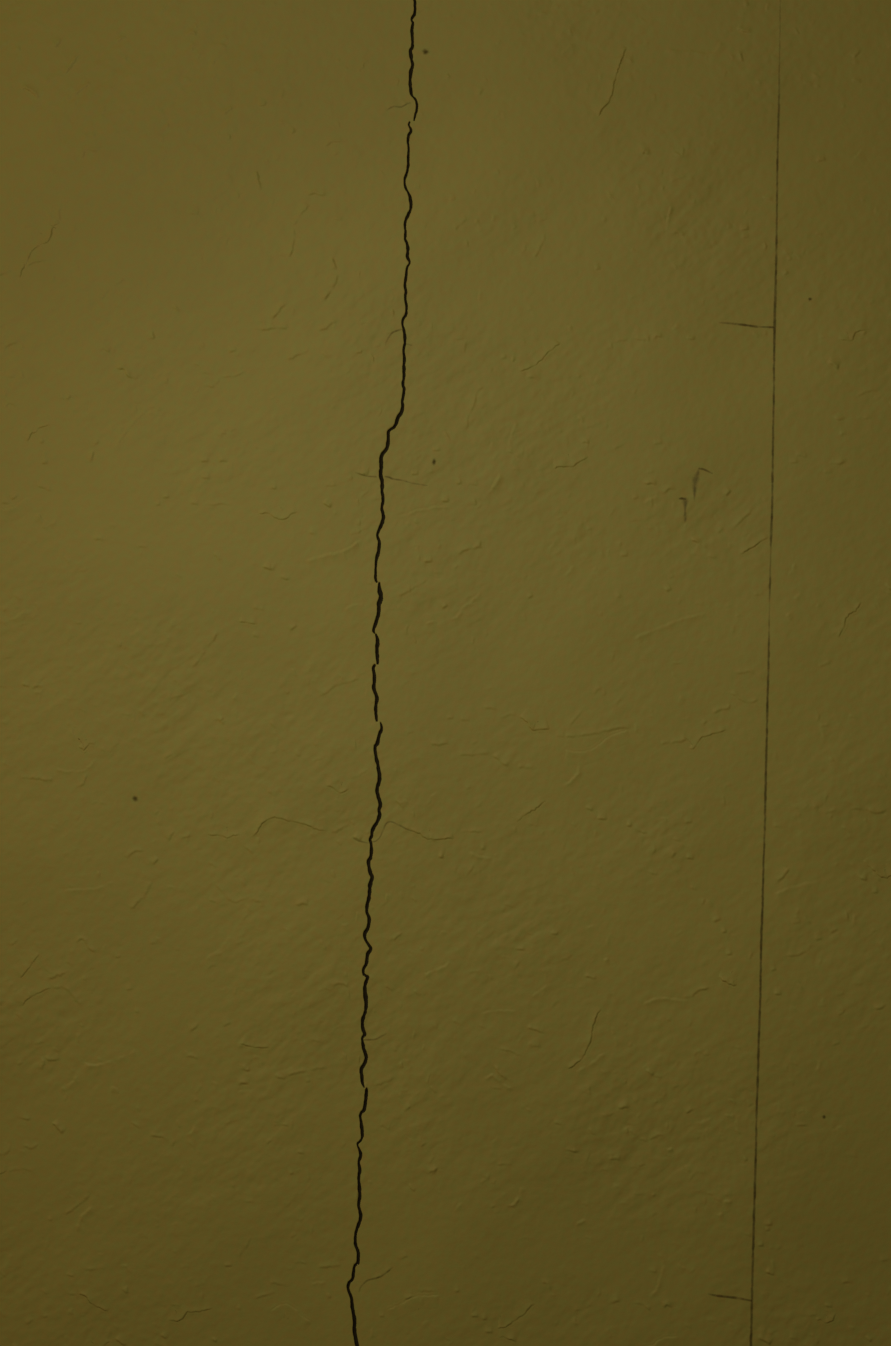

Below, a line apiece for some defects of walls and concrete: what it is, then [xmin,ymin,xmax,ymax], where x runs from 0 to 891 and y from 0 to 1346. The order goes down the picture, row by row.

crack [347,0,418,1346]